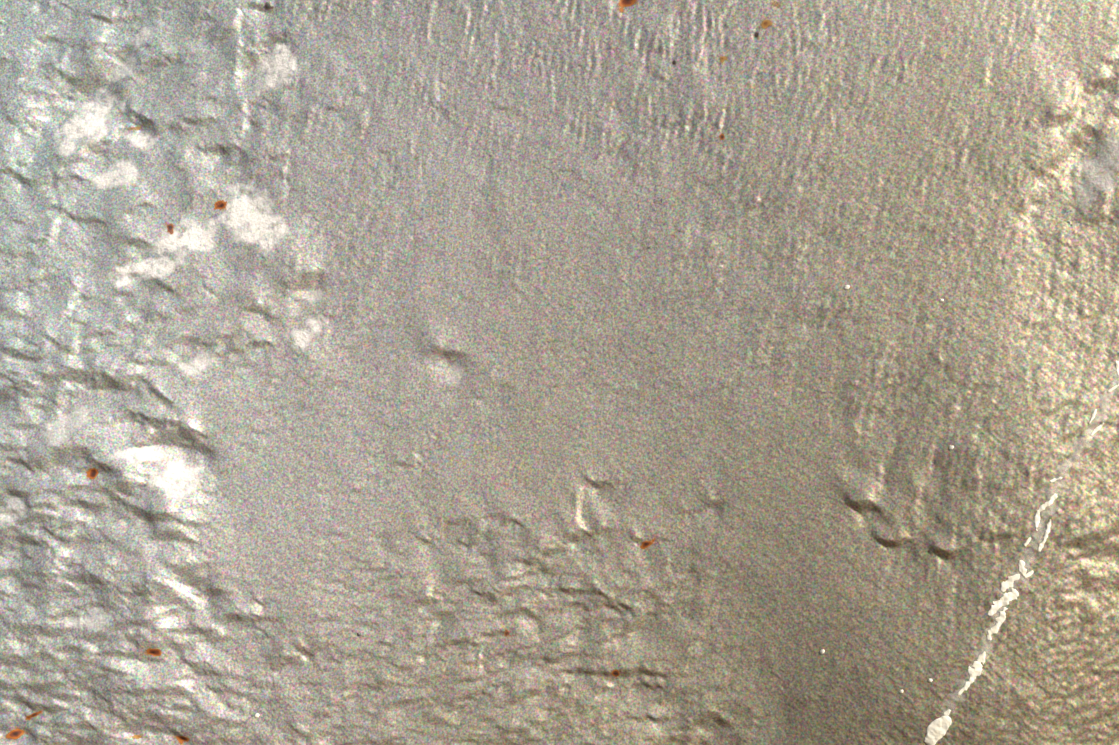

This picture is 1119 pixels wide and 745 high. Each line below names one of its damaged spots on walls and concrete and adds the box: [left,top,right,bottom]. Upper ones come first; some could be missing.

corrosion [619,0,636,12]
corrosion [6,711,42,739]